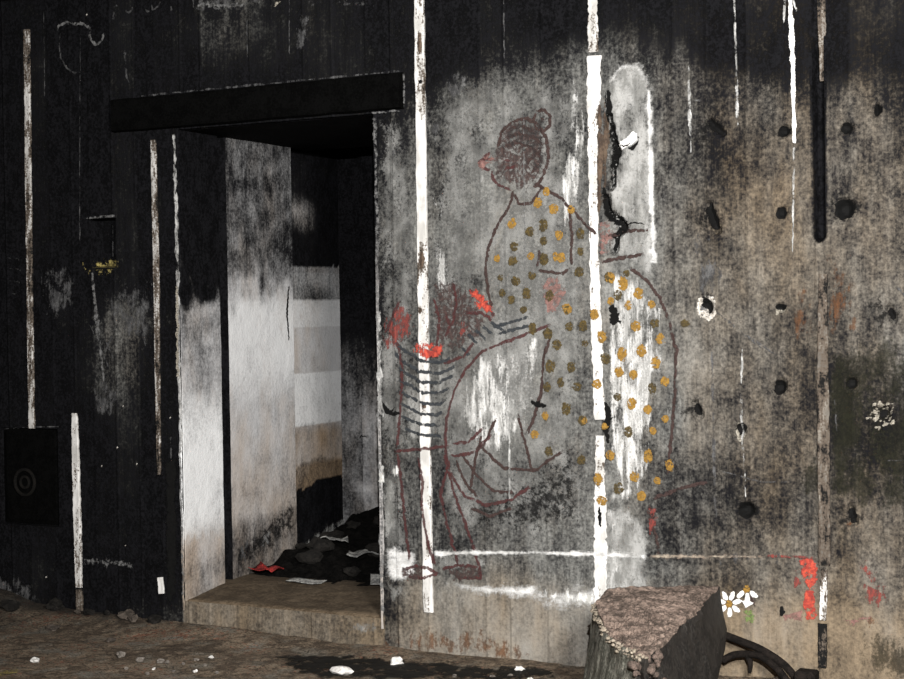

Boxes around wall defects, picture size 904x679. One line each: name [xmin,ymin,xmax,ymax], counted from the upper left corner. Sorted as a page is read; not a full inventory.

crack [599,90,644,254]
spalling [697,293,716,321]